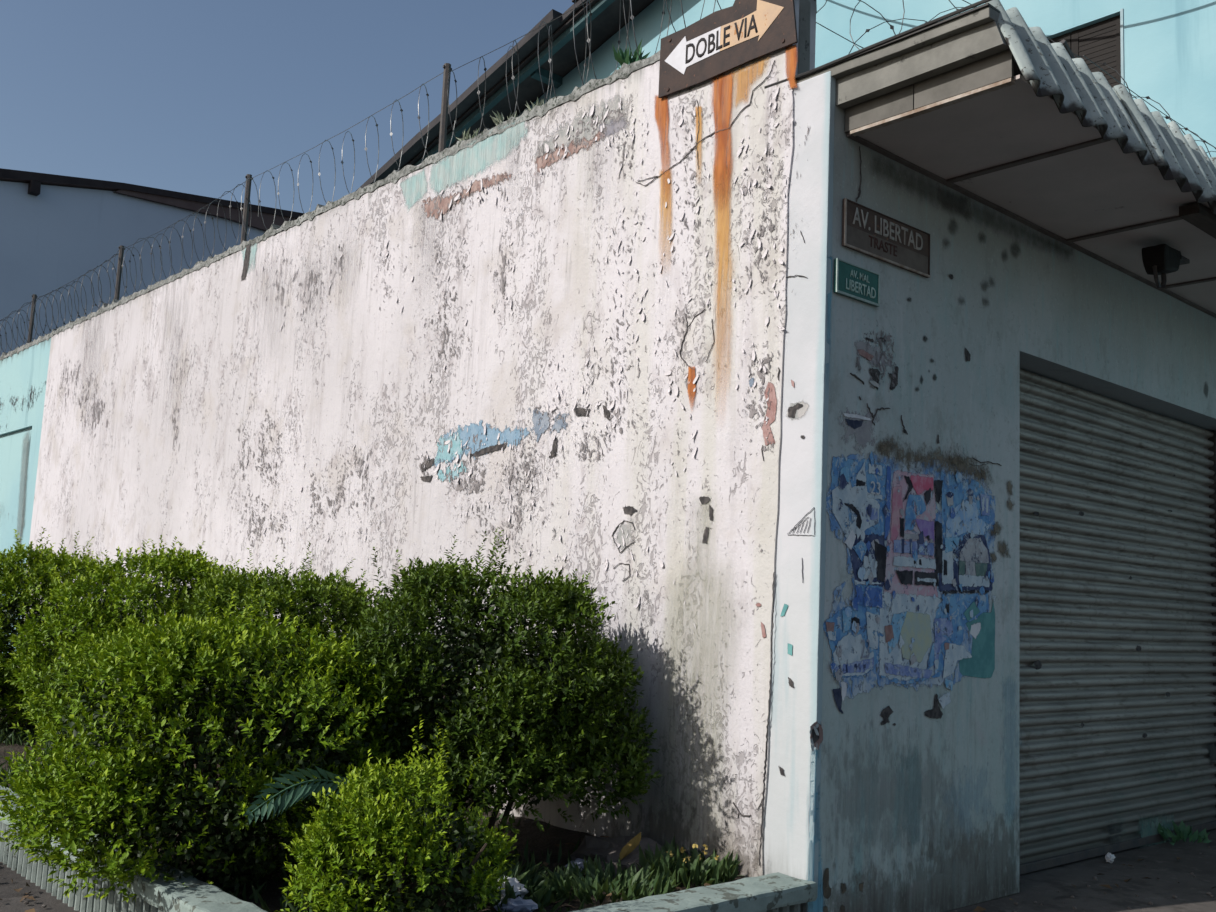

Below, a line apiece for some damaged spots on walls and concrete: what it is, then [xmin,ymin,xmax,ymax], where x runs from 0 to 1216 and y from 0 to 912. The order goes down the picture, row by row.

rust [786,44,797,88]
rust [655,96,671,232]
rust [696,60,764,331]
peeling [731,87,809,330]
peeling [366,223,471,396]
peeling [400,95,713,658]
spalling [735,342,809,461]
peeling [855,322,901,390]
spalling [833,681,847,714]
spalling [924,694,943,719]
peeling [959,603,995,678]